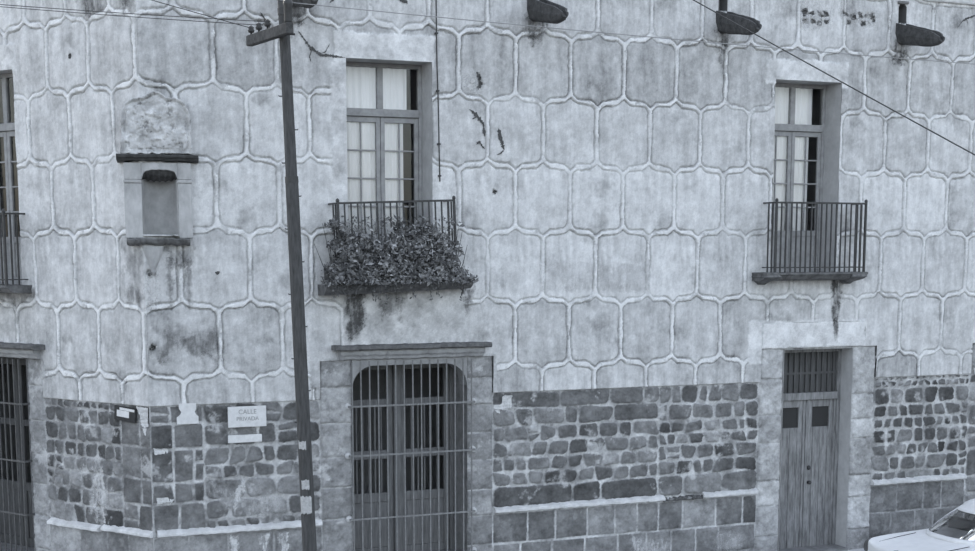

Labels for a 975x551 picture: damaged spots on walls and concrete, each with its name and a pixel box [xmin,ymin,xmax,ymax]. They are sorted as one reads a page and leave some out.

flaking render [464,72,483,92]
leakage [345,294,366,339]